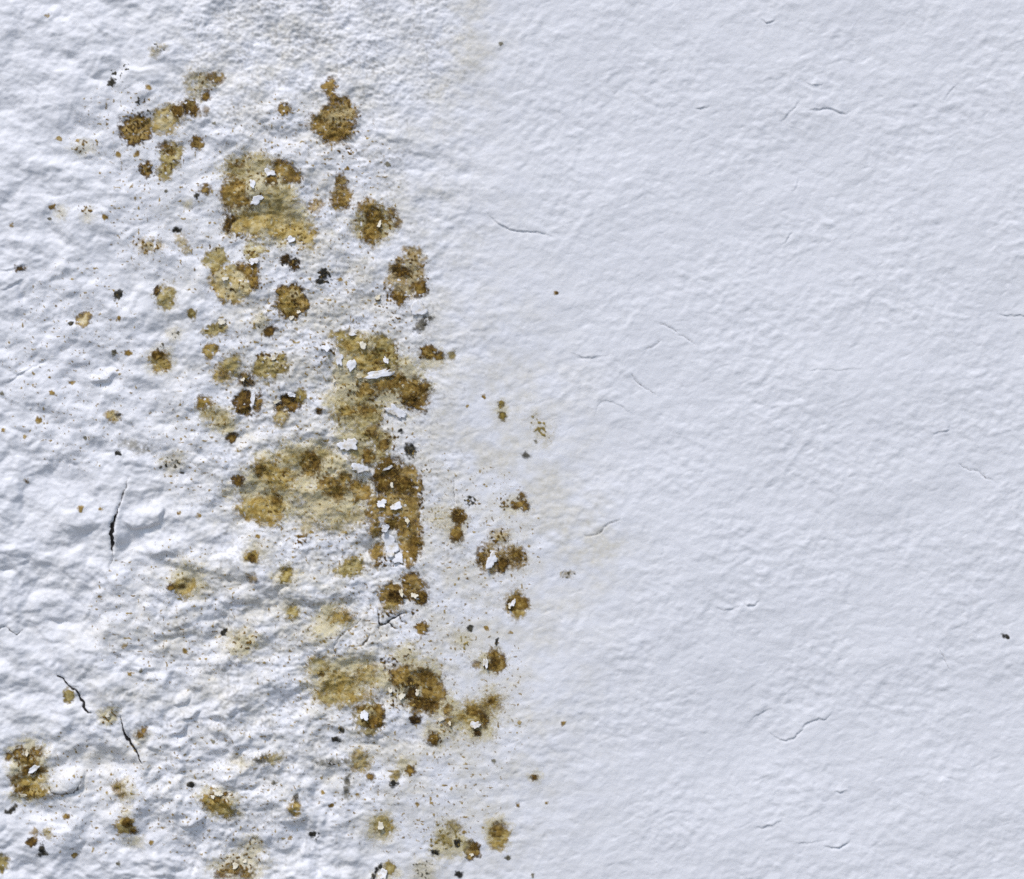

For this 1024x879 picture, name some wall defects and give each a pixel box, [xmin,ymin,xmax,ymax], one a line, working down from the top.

damp [83,65,224,265]
damp [22,268,125,337]
damp [96,404,121,421]
damp [101,76,541,879]
crack [109,487,127,550]
damp [63,690,74,704]
crack [57,675,90,713]
crack [121,722,141,762]
damp [4,718,320,879]
damp [0,854,9,874]